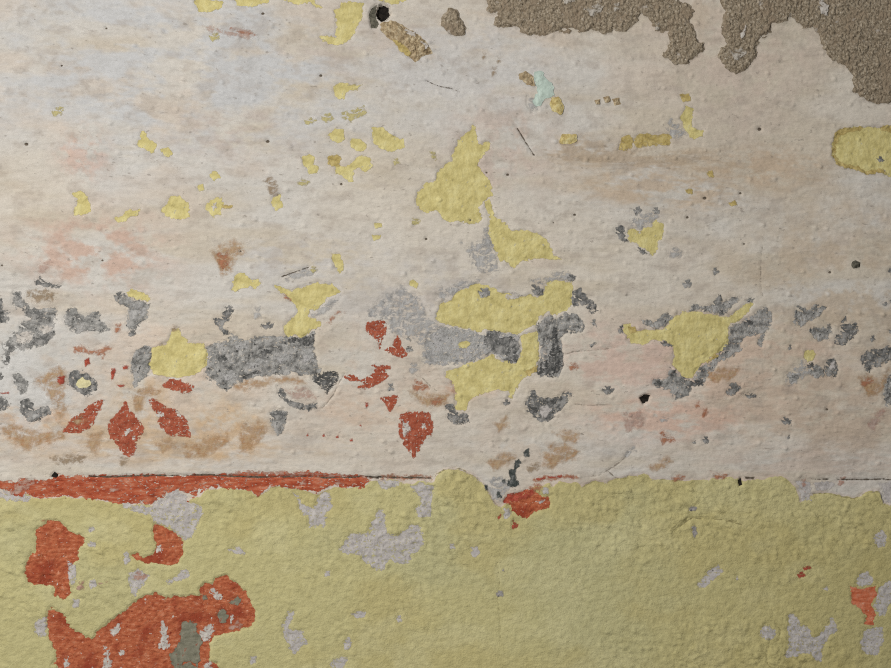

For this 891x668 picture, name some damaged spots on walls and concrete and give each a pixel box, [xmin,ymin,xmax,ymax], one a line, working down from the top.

spalling [486,0,705,65]
spalling [717,0,891,104]
peeling [831,125,891,177]
peeling [368,125,598,425]
peeling [0,291,110,422]
peeling [111,266,361,436]
peeling [618,294,772,403]
peeling [786,304,859,384]
peeling [860,335,891,373]
peeling [503,484,550,529]
peeling [24,489,256,668]
peeling [850,571,891,656]